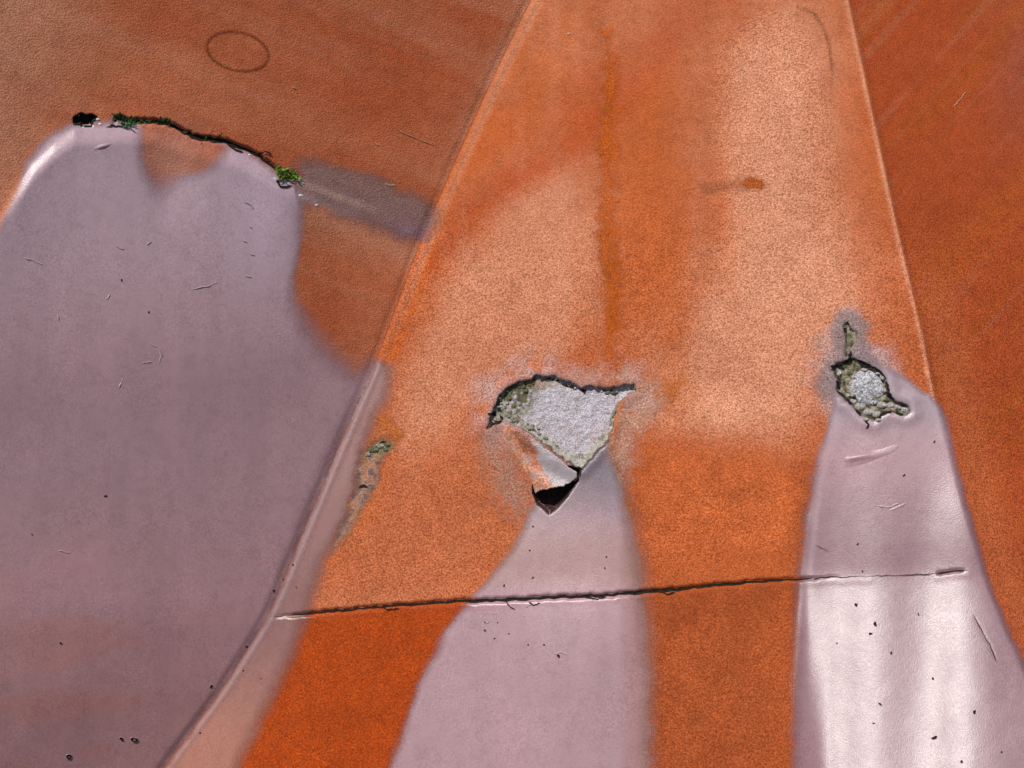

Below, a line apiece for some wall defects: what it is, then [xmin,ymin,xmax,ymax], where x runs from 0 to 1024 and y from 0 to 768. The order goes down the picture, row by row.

crack [107,119,319,206]
spalling [830,322,909,428]
water stain [0,120,436,768]
spalling [486,375,636,514]
crack [270,570,966,617]